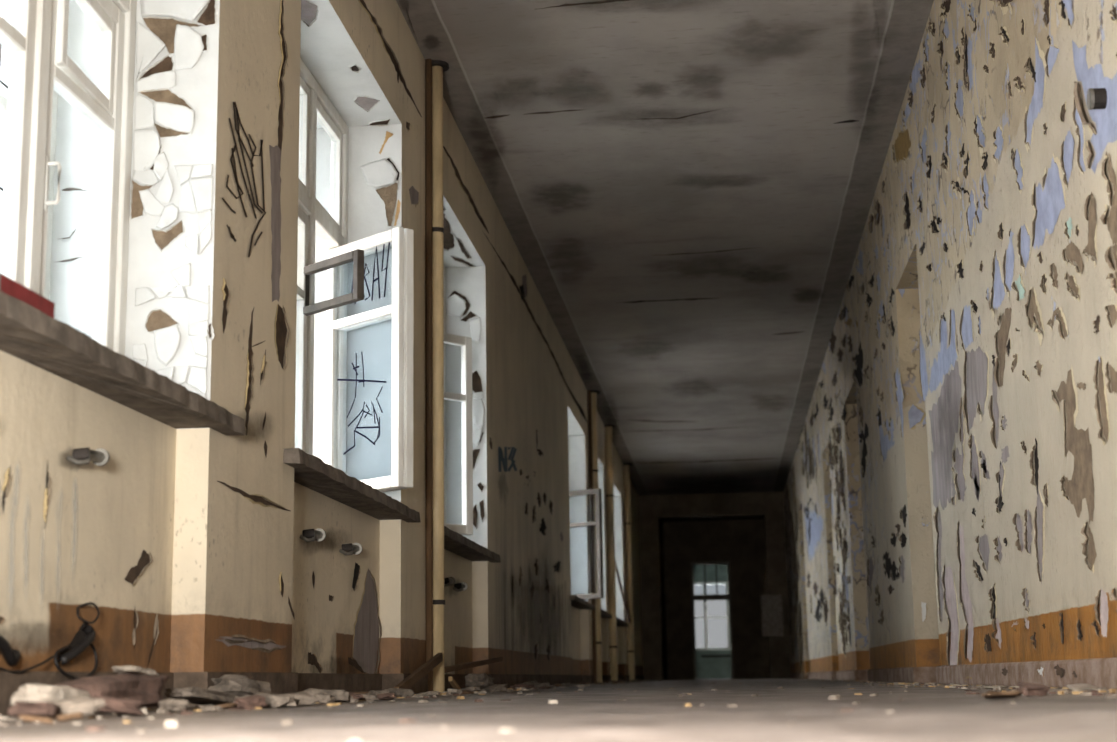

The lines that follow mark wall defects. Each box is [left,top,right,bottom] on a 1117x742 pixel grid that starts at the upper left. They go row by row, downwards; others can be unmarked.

crack [277,0,288,192]
crack [358,0,422,117]
crack [540,0,630,9]
peeling [130,0,219,399]
peeling [352,95,419,228]
peeling [784,0,1117,672]
crack [217,481,291,511]
peeling [519,469,553,536]
peeling [125,549,153,586]
peeling [348,562,382,674]
peeling [1037,664,1078,678]